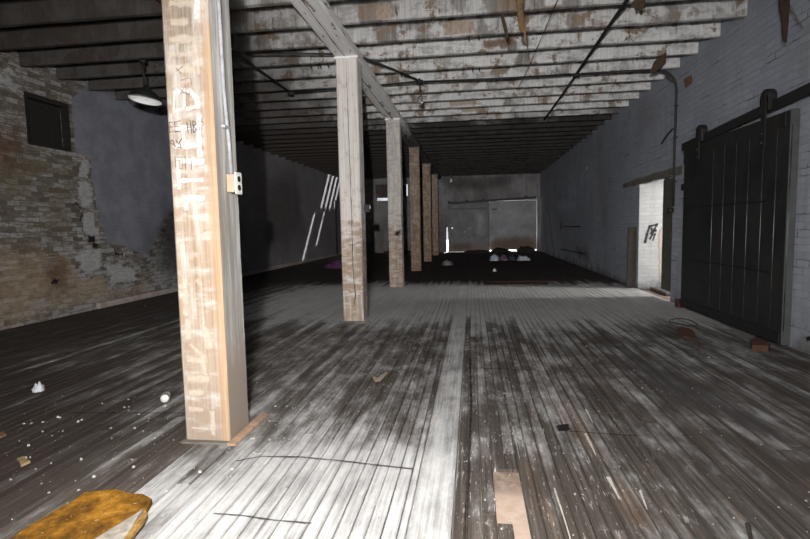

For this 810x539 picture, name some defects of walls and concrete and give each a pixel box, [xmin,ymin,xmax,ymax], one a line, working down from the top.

peeling [371,0,396,21]
peeling [440,15,478,36]
peeling [0,51,33,107]
peeling [446,99,483,113]
peeling [64,79,174,291]
water stain [0,137,156,331]